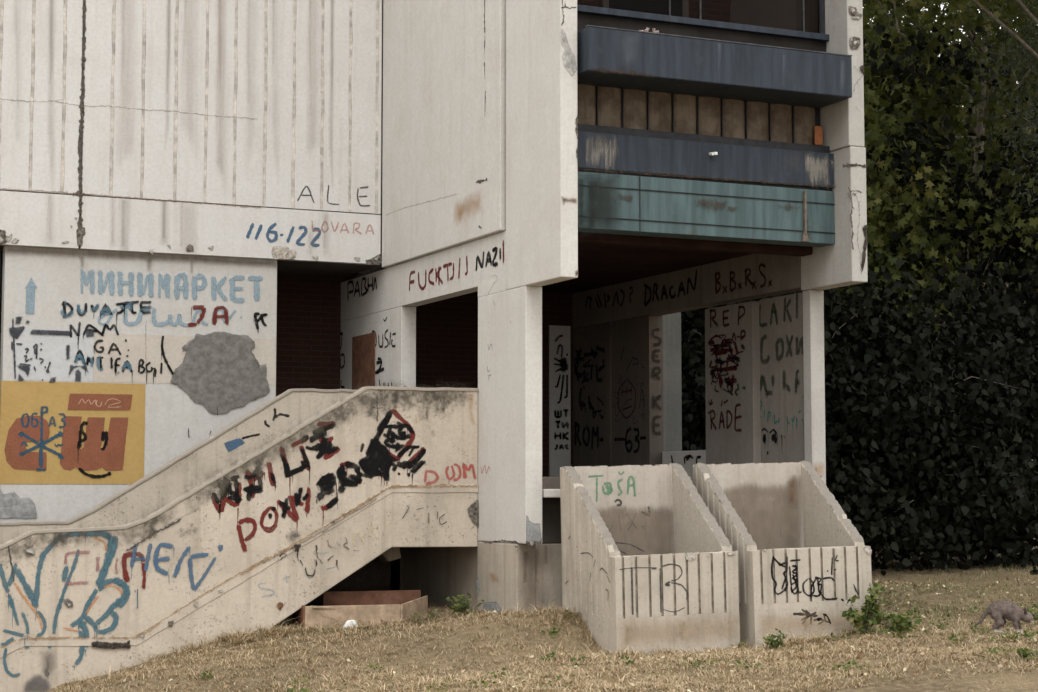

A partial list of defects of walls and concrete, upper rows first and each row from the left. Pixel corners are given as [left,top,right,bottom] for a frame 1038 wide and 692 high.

spalling [0,230,19,245]
crack [73,0,90,242]
peeling [575,115,619,168]
peeling [805,156,834,185]
crack [843,163,867,250]
peeling [171,332,270,414]